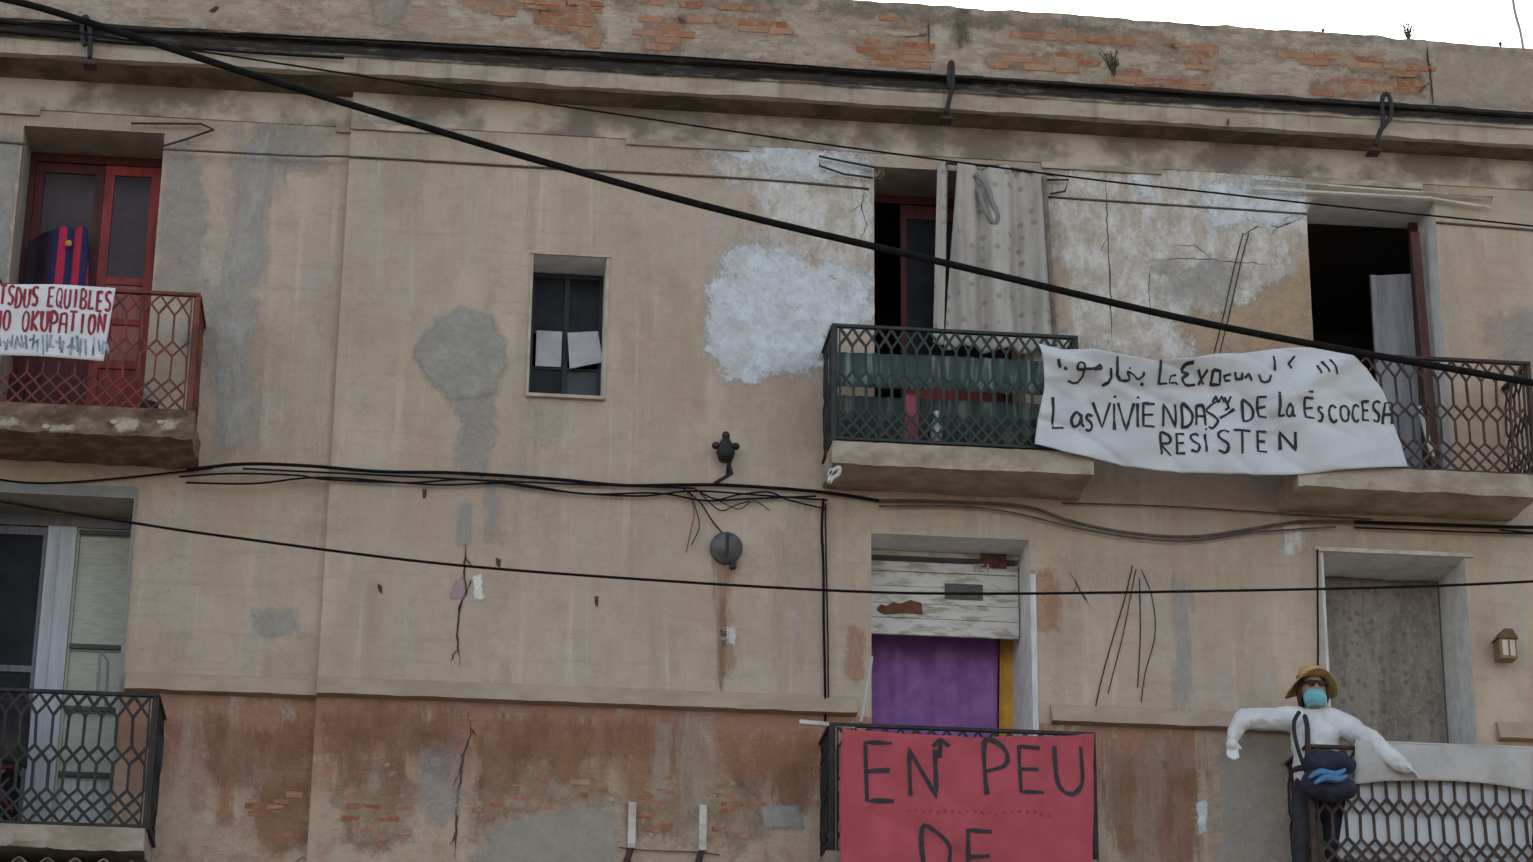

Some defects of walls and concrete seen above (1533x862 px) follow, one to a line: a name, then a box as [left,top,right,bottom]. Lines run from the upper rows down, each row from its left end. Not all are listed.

spalling [462,0,605,49]
spalling [622,0,797,53]
spalling [844,33,935,69]
spalling [985,27,1224,91]
spalling [1276,48,1437,98]
peeling [700,147,874,384]
crack [450,542,472,666]
spalling [245,785,309,855]
spalling [332,763,418,850]
crack [450,712,476,856]
spalling [473,763,698,843]